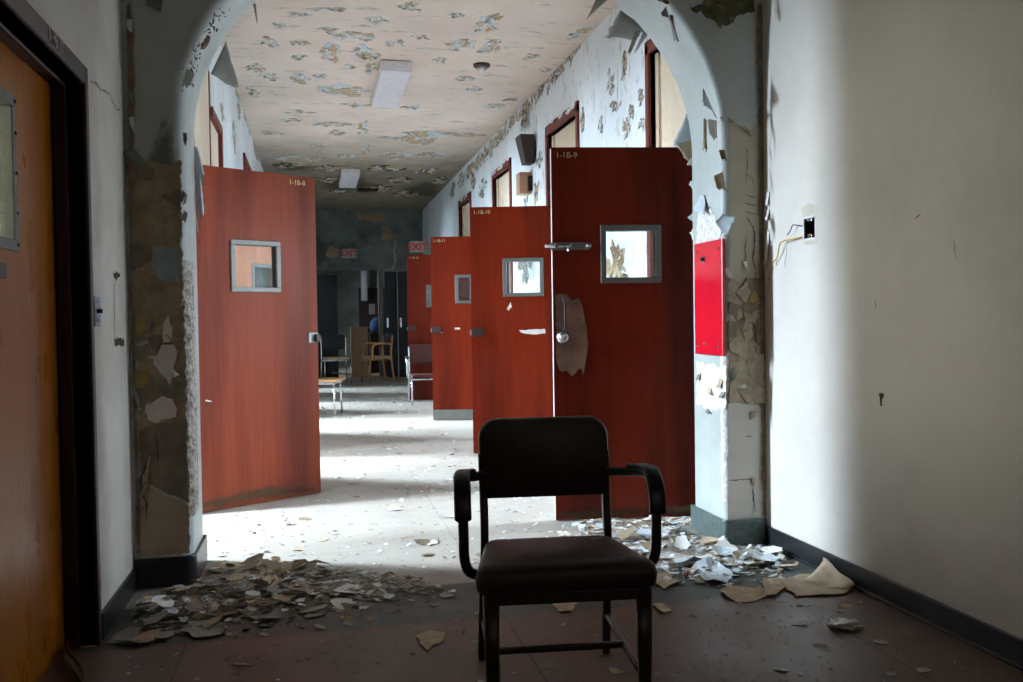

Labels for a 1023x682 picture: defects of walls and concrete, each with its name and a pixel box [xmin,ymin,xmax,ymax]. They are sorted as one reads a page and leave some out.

peeling [397,2,421,12]
peeling [260,7,430,76]
peeling [432,13,503,63]
crack [90,81,121,111]
peeling [220,25,594,202]
peeling [524,180,540,206]
peeling [696,117,761,278]
peeling [114,160,211,518]
crack [729,477,755,509]